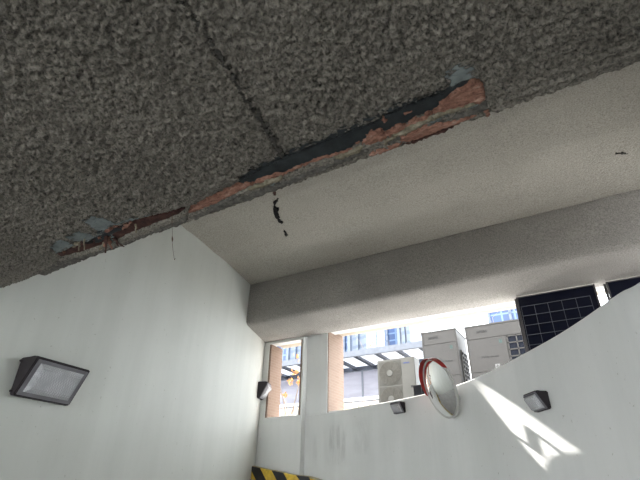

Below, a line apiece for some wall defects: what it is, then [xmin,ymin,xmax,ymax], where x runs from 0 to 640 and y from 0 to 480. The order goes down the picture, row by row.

crack [177,0,285,159]
spalling [38,64,488,276]
crack [273,191,288,237]